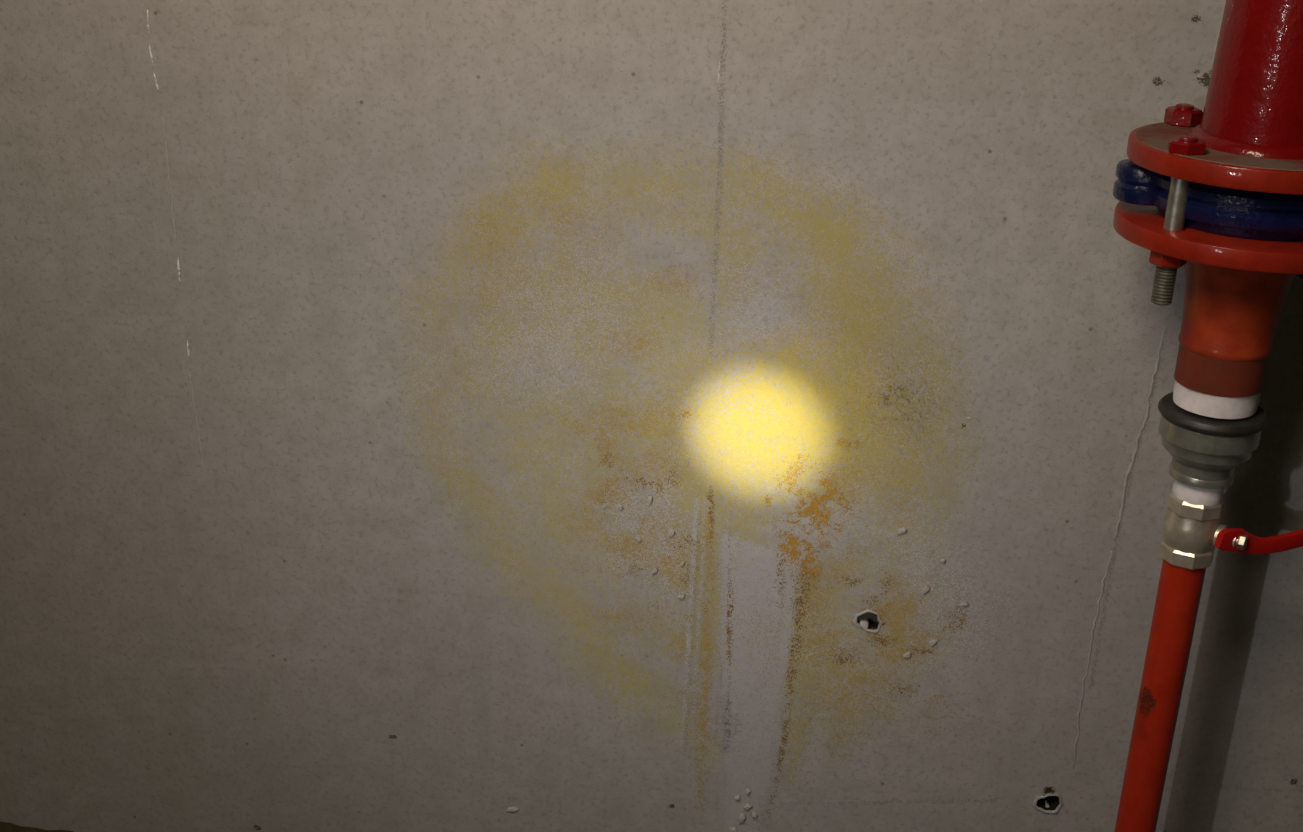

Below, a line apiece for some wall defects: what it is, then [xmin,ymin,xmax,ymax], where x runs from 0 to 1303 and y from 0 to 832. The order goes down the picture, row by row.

crack [707,0,729,354]
leakage [387,120,1006,832]
crack [679,495,732,756]
corrosion [764,453,863,733]